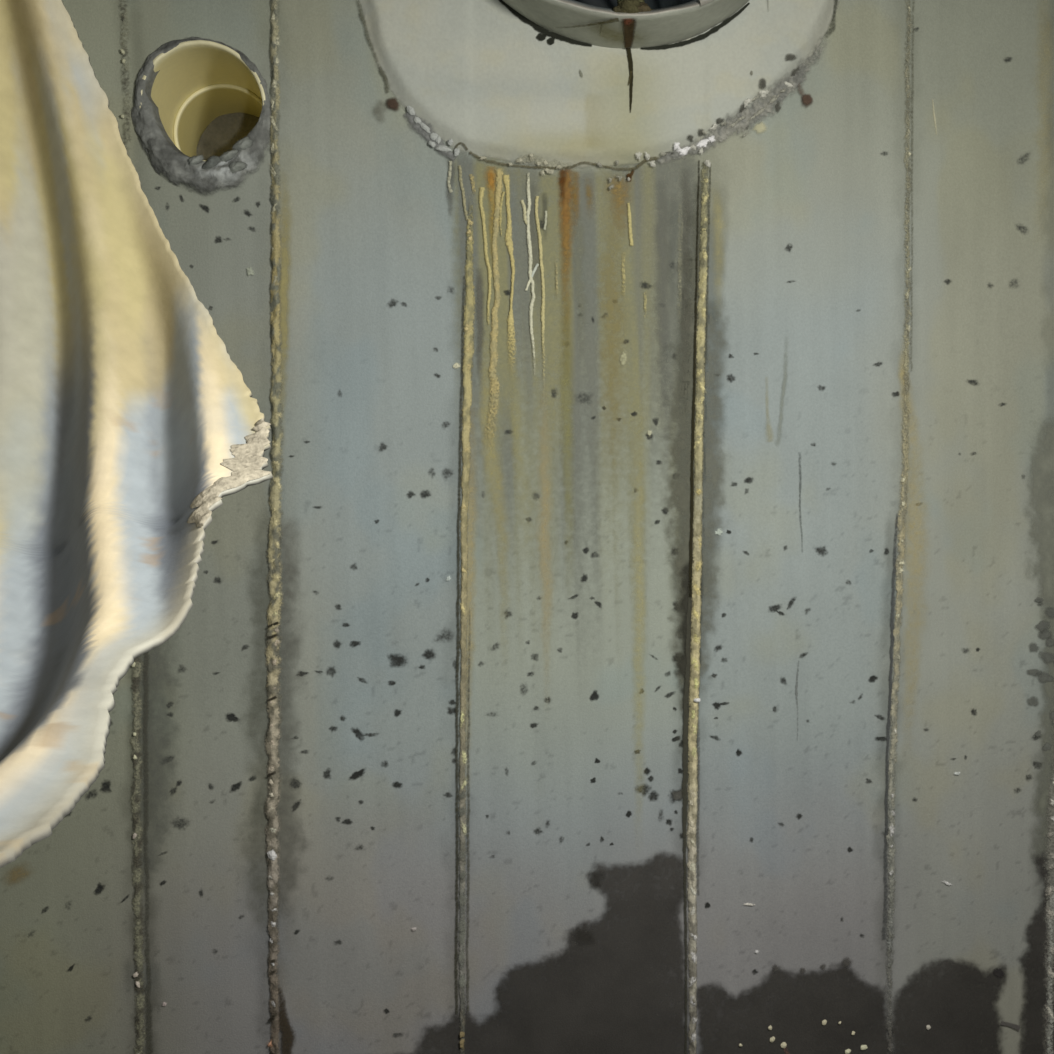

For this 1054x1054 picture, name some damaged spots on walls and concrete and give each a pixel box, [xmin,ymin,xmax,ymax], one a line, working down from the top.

crack [499,0,592,47]
crack [626,3,750,112]
rust [488,169,496,233]
crack [454,142,657,178]
rust [560,169,590,282]
leakage [404,46,823,722]
leakage [416,425,1054,1054]